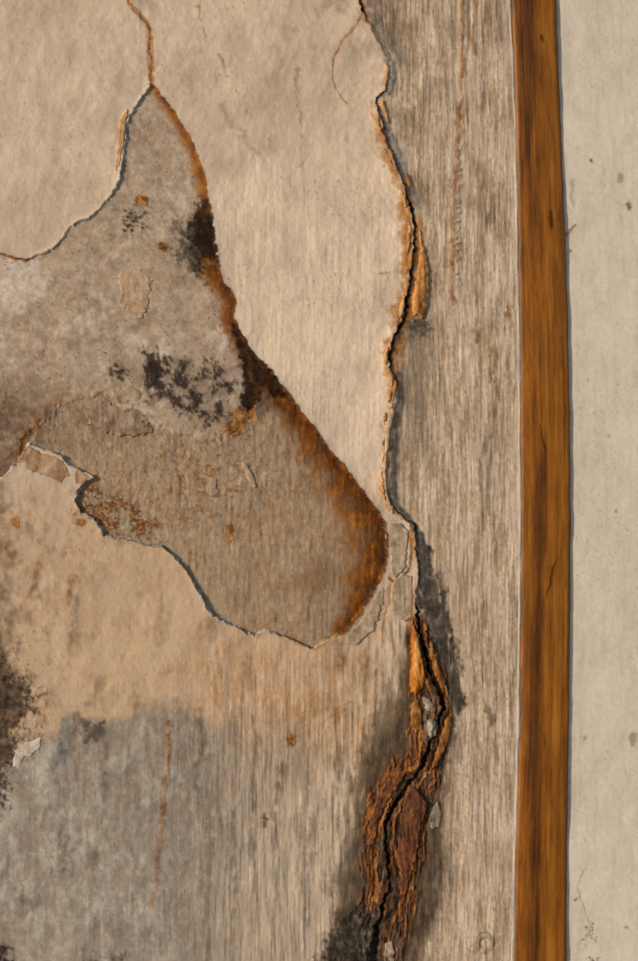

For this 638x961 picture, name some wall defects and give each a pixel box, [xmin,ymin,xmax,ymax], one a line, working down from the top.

crack [127,0,154,85]
flaking render [0,86,368,649]
leakage [141,323,287,429]
crack [332,0,444,954]
leakage [0,648,216,961]
leakage [321,532,467,961]